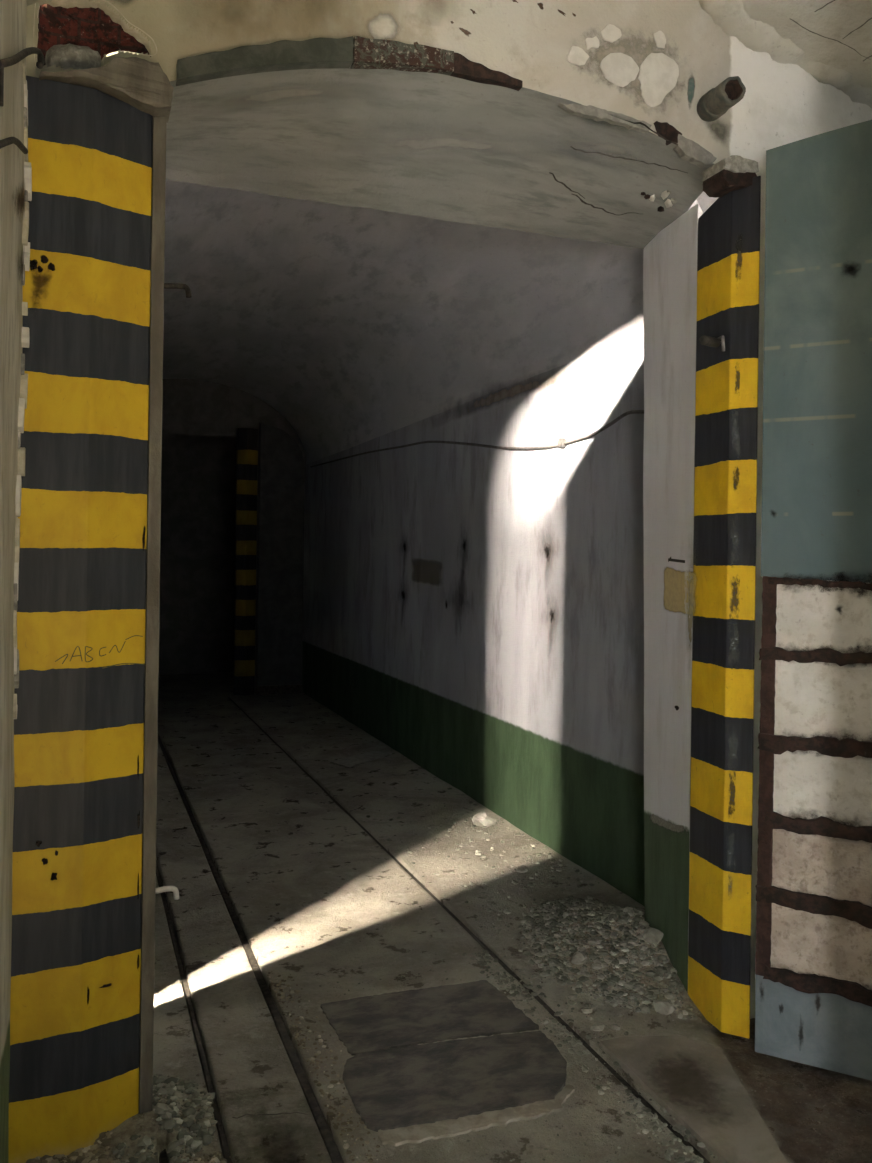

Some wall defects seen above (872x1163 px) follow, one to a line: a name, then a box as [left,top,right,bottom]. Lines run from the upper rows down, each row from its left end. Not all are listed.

peeling [567,24,683,107]
spalling [21,0,158,286]
crack [549,172,639,215]
crack [570,115,687,173]
spalling [557,103,759,198]
spalling [13,302,30,719]